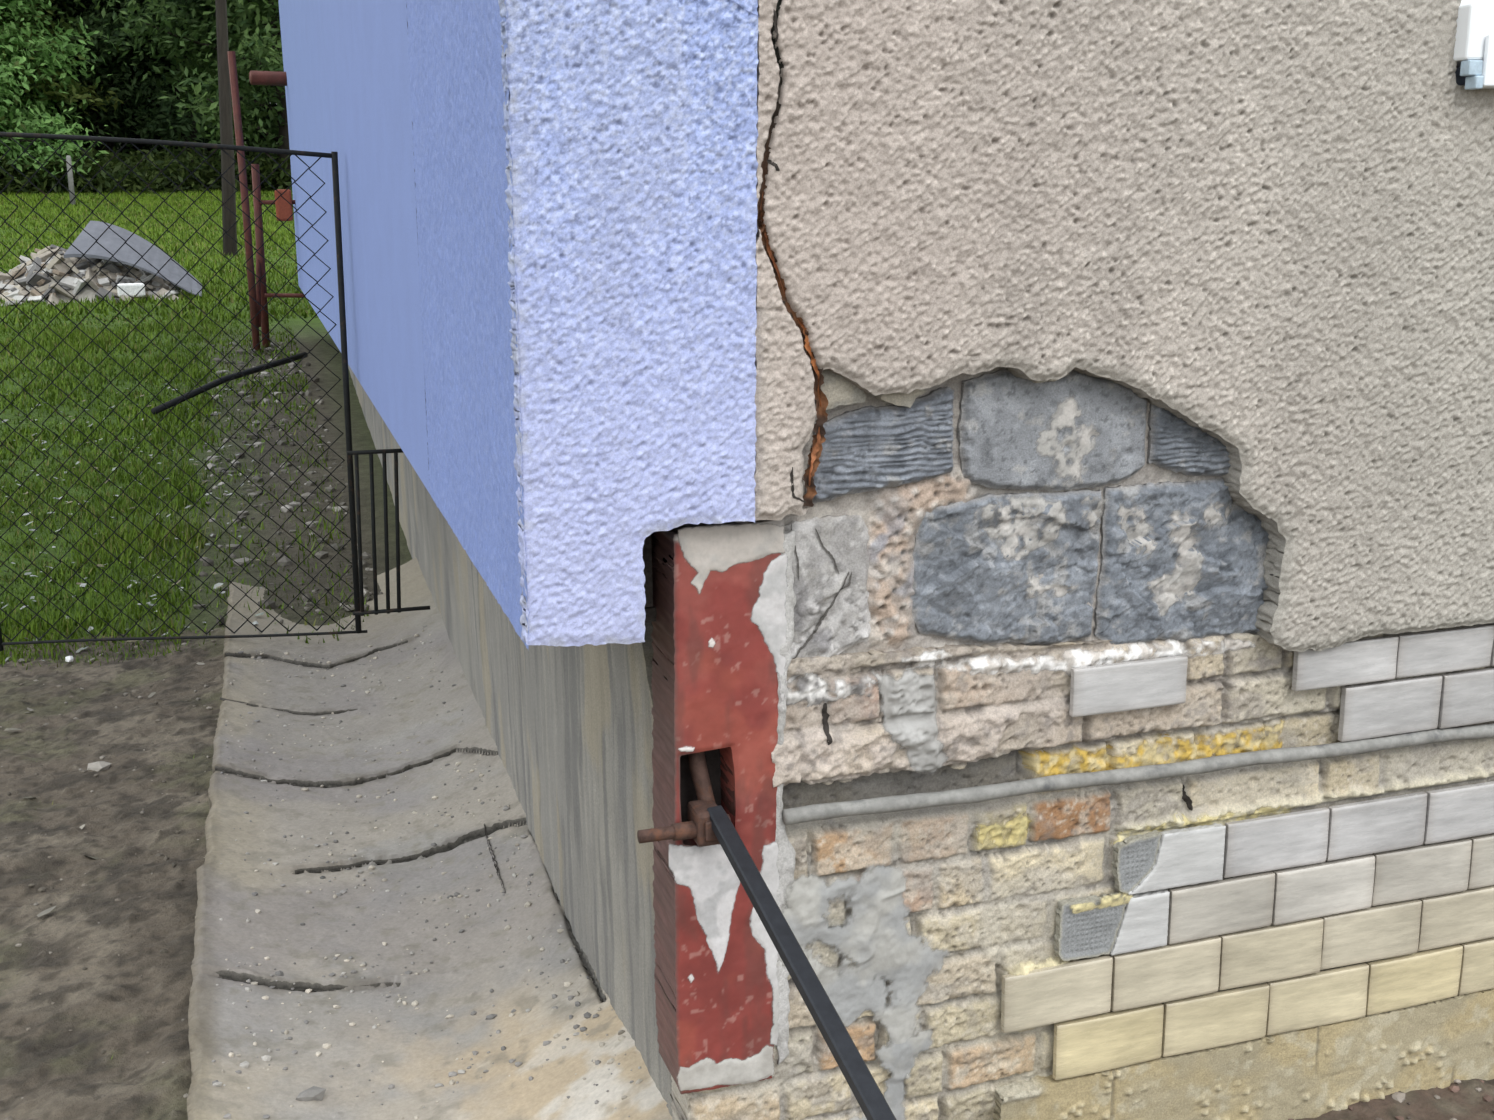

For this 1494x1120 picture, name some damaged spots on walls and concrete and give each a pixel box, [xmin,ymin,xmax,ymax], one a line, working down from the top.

rust [760,191,785,294]
crack [731,0,852,659]
rust [797,319,821,407]
crack [225,640,408,669]
crack [220,697,358,716]
crack [215,747,498,788]
flaking render [669,367,1494,1120]
crack [295,818,526,893]
crack [215,970,401,992]